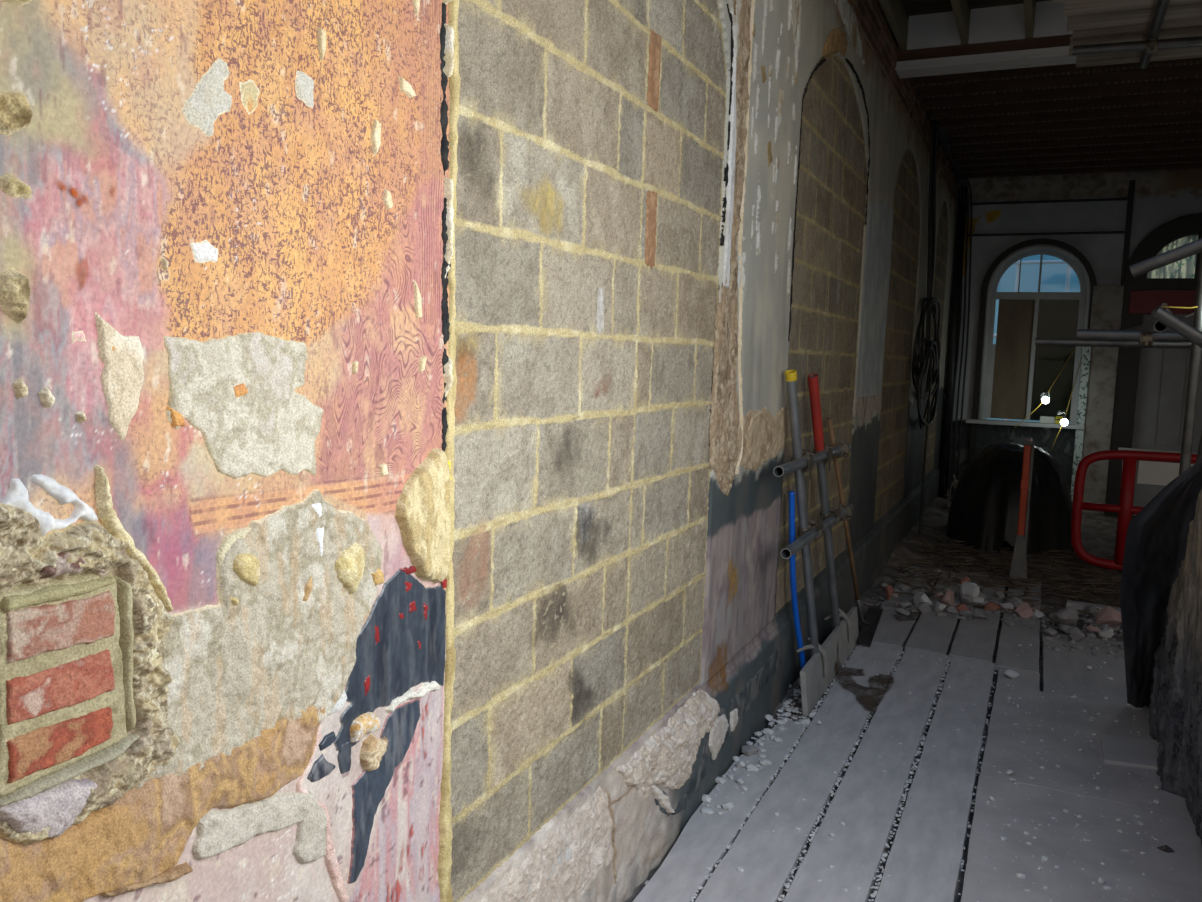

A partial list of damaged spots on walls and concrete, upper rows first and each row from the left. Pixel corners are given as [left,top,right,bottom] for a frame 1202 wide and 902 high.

peeling [182,58,259,137]
peeling [729,0,802,303]
spalling [0,313,447,902]
peeling [617,646,781,817]
flaking render [478,786,613,902]